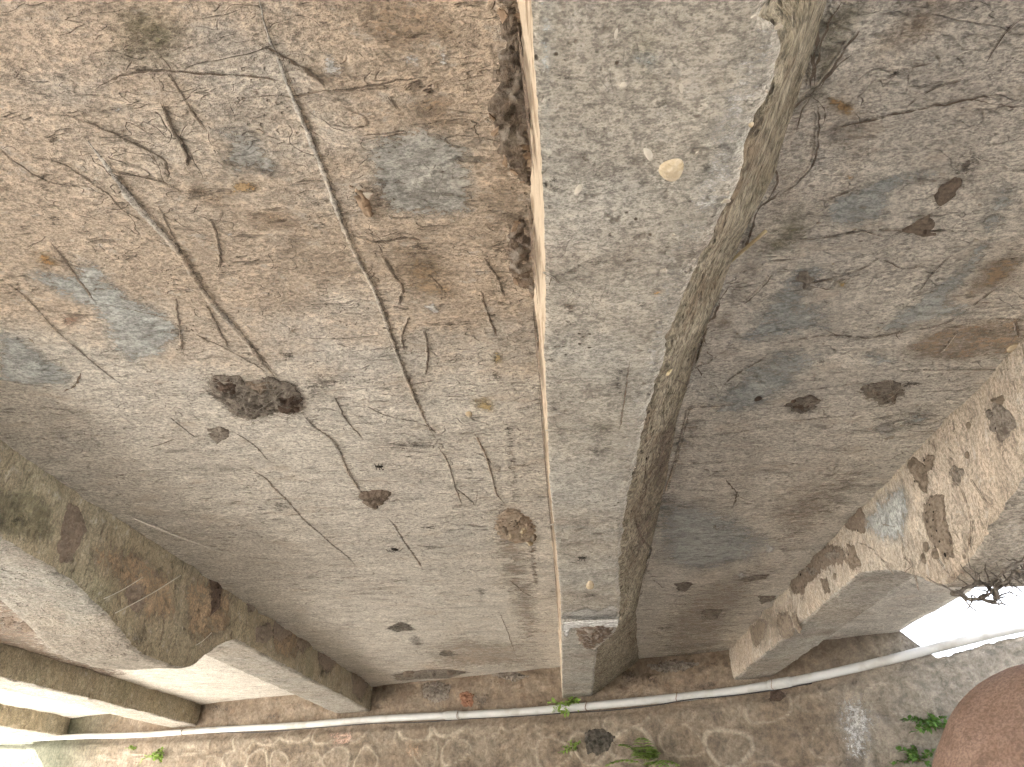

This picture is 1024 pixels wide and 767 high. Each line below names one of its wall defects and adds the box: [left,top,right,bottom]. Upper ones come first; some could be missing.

crack [0,43,445,255]
spalling [487,0,532,186]
crack [740,2,1024,295]
crack [49,242,266,372]
crack [206,212,224,271]
crack [308,231,505,397]
spalling [504,215,535,298]
crack [662,270,1024,407]
crack [333,395,447,457]
crack [634,449,759,588]
crack [960,474,995,548]
spalling [560,605,619,650]